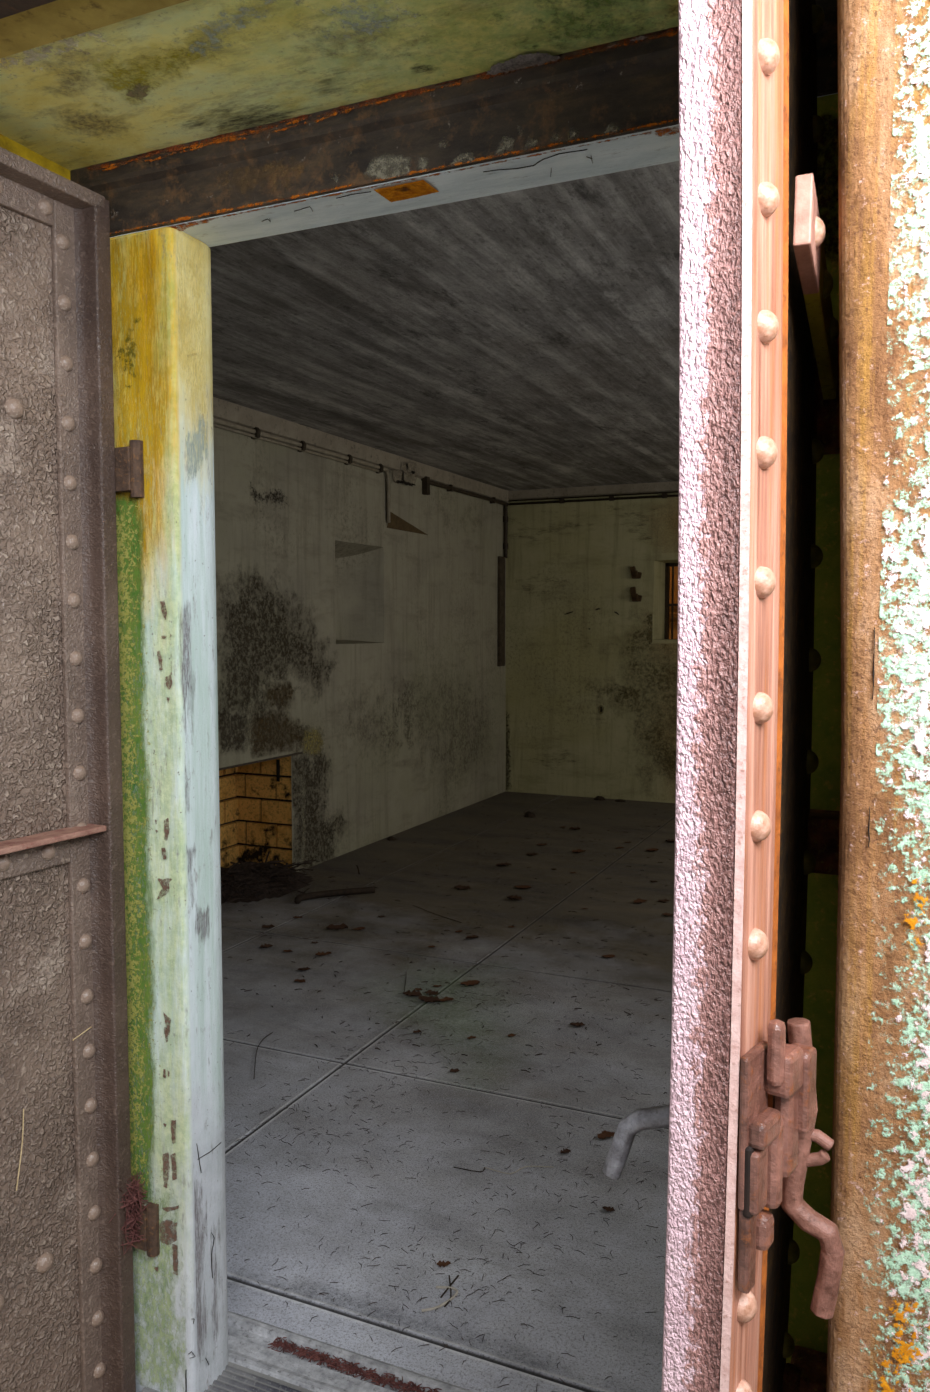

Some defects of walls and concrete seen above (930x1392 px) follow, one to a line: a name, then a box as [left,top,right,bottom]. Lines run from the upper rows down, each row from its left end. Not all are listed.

corrosion [87,28,679,171]
corrosion [110,119,679,234]
damp [617,631,677,775]